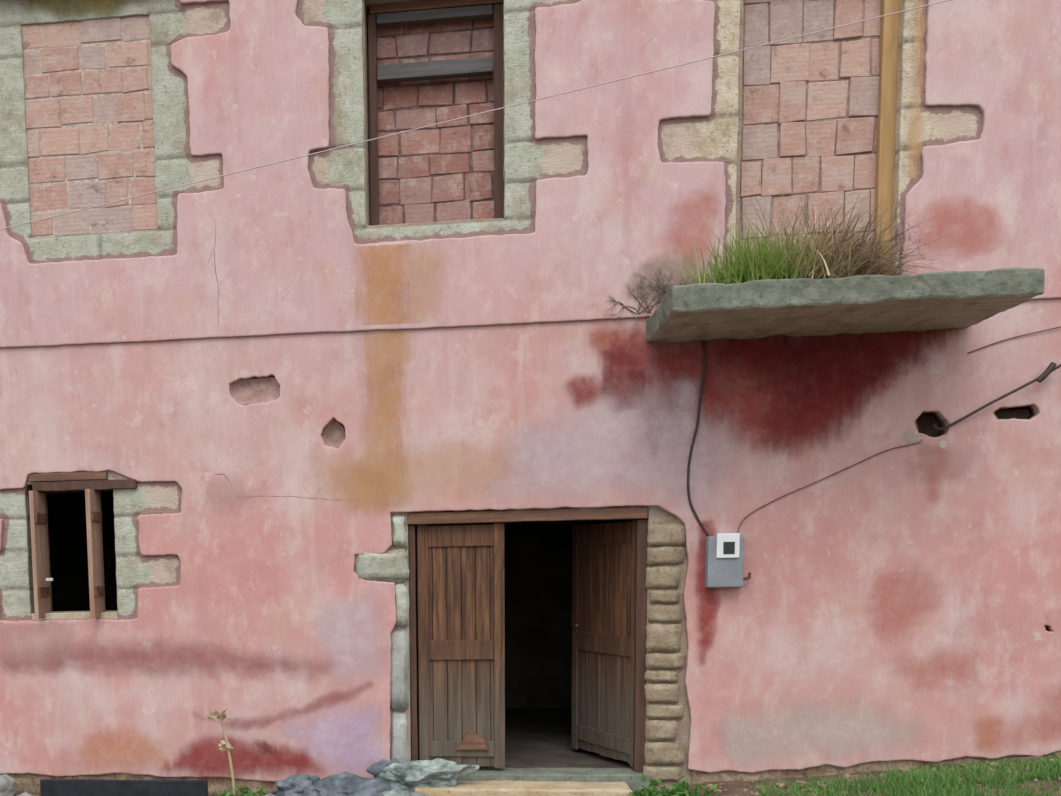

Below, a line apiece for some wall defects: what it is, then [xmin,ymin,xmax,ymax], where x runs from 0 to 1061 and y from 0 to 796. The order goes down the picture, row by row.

crack [209,224,219,323]
hole [230,377,280,405]
damp [513,330,933,499]
hole [323,419,345,447]
damp [175,740,314,774]